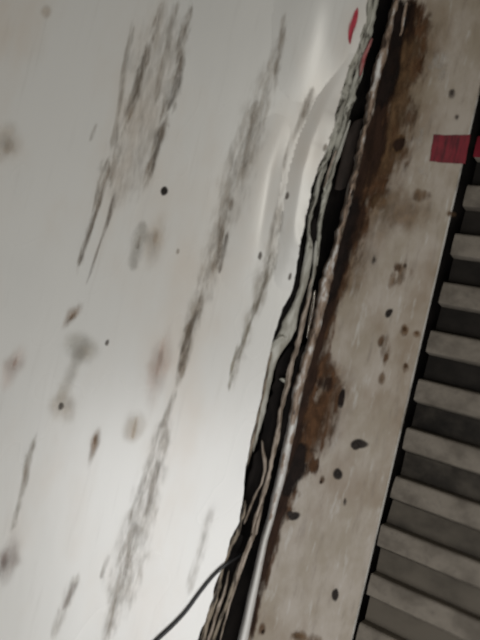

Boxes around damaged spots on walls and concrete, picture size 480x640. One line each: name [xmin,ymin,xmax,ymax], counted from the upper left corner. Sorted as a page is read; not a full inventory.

peeling [200,0,379,640]
rust [249,0,431,637]